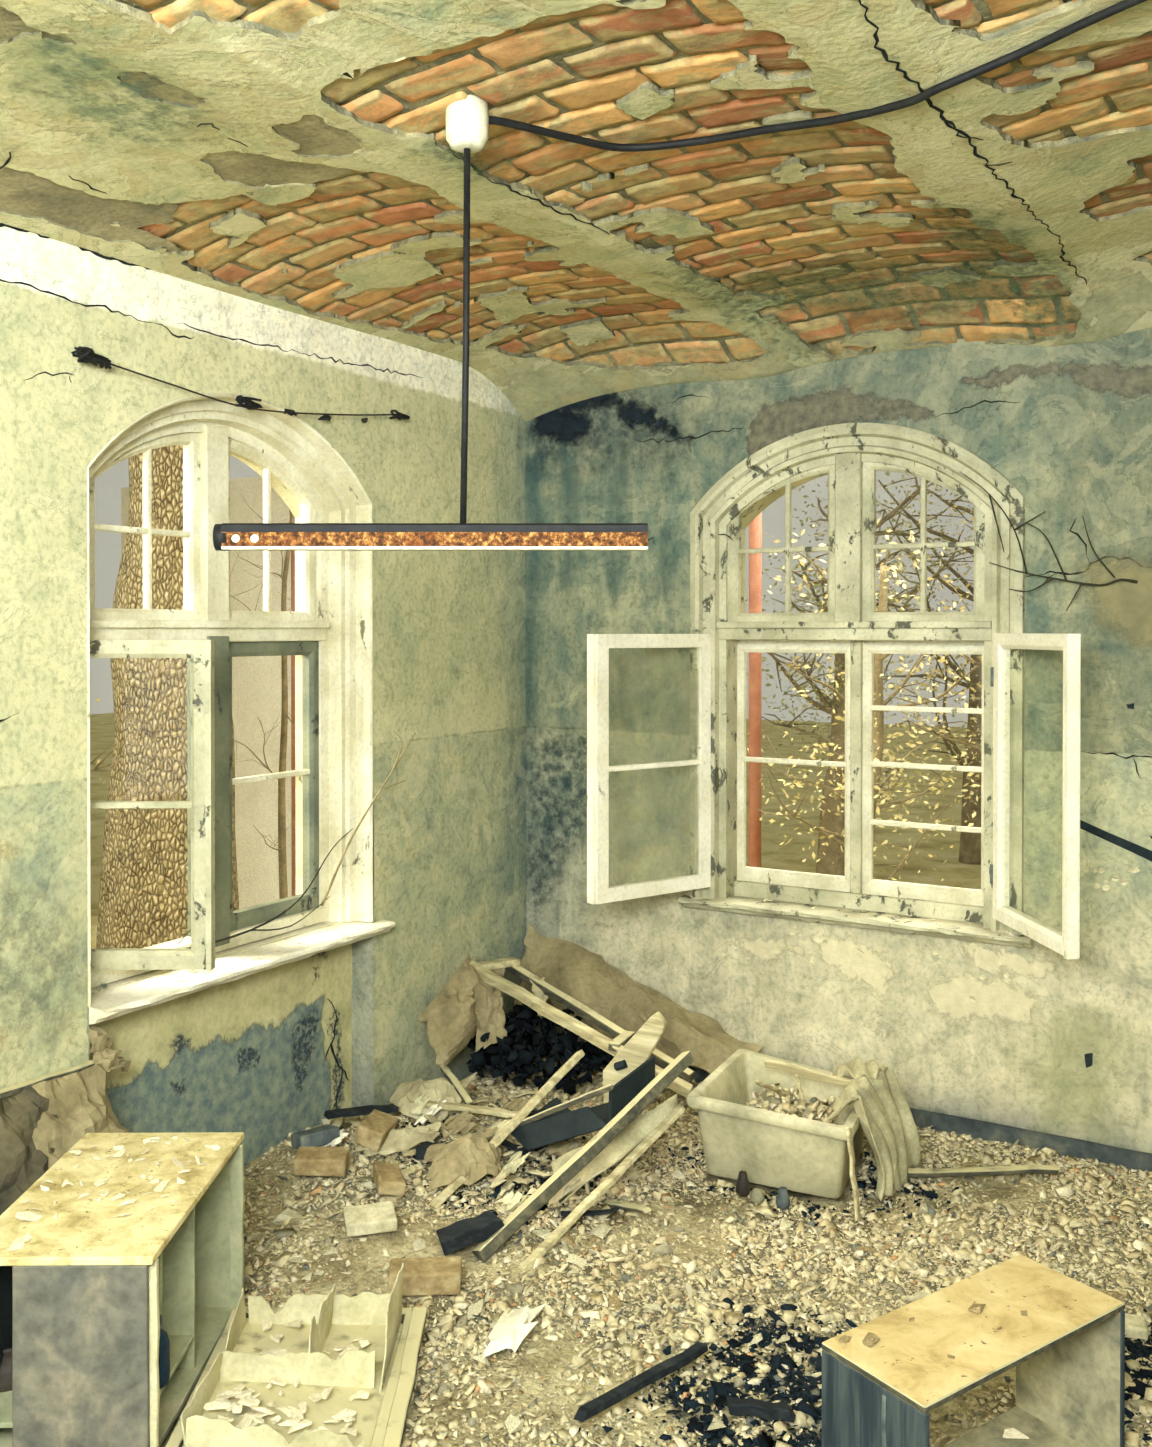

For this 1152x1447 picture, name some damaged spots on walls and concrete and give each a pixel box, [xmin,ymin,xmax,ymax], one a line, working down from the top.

flaking render [981,30,1152,143]
flaking render [0,0,1081,367]
crack [858,0,1087,285]
flaking render [1085,155,1152,217]
crack [0,223,149,270]
crack [24,371,73,383]
crack [0,279,424,378]
flaking render [746,388,934,456]
leakage [526,735,587,903]
spalling [1080,820,1152,891]
peeling [106,996,344,1166]